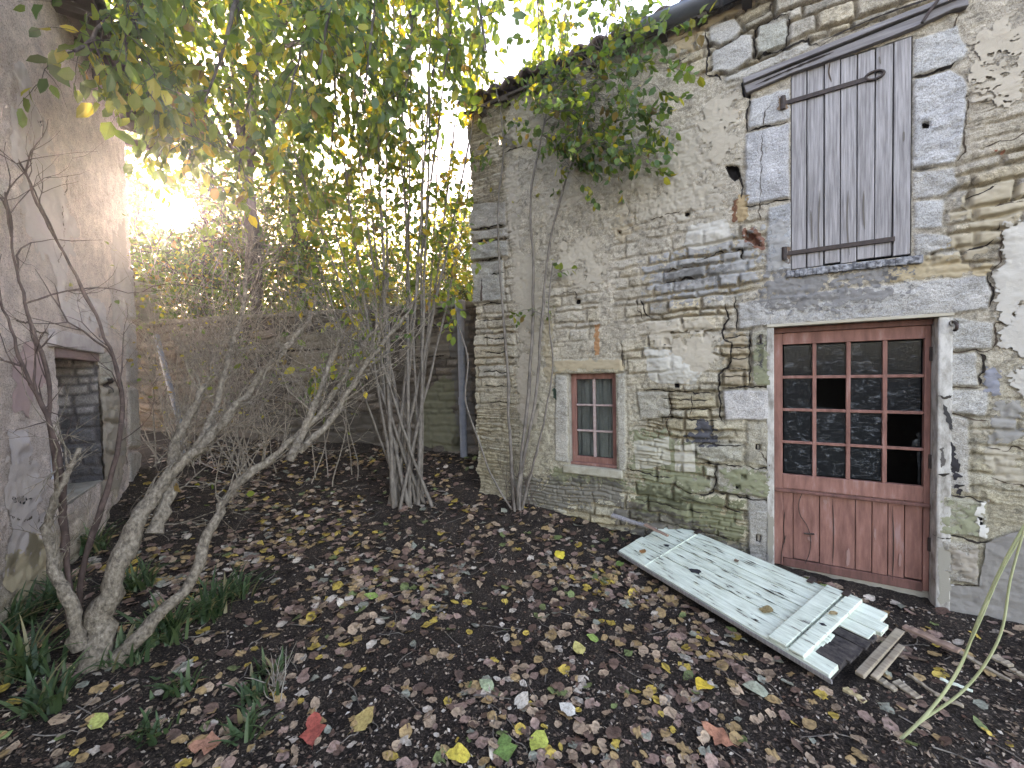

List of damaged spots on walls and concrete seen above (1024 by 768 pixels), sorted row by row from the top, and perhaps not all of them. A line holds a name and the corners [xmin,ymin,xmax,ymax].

peeling [968,11,1024,116]
rust [732,194,765,250]
spalling [885,169,1024,491]
crack [627,298,775,544]
water stain [507,474,750,555]
spalling [948,500,989,585]